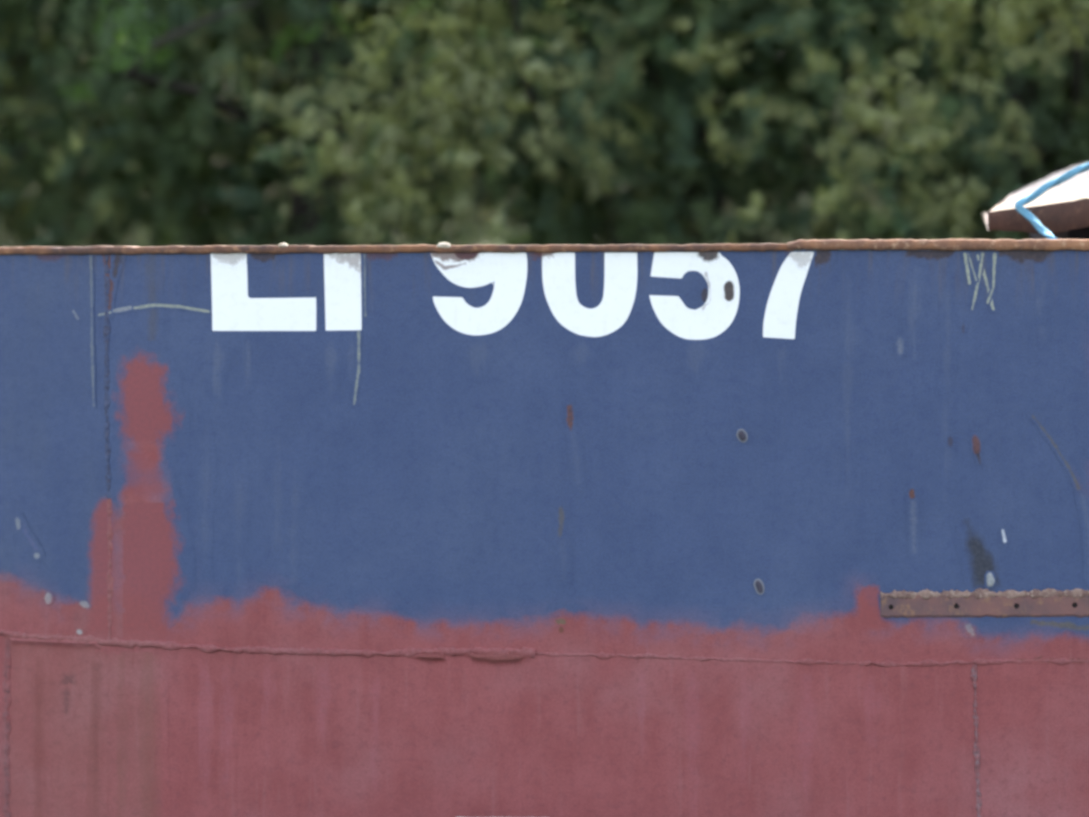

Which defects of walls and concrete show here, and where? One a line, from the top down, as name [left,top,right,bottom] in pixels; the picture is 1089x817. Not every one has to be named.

rust [524,252,557,266]
rust [693,251,725,266]
rust [902,250,960,265]
peeling [95,341,196,655]
peeling [853,580,886,634]